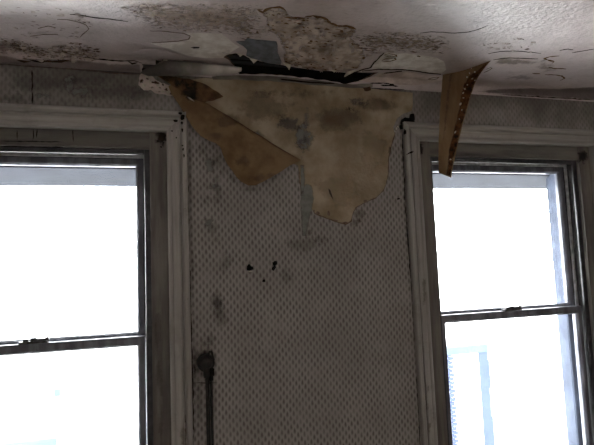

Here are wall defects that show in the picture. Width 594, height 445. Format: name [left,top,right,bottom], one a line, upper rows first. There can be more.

flaking render [121,4,451,225]
leakage [257,6,365,73]